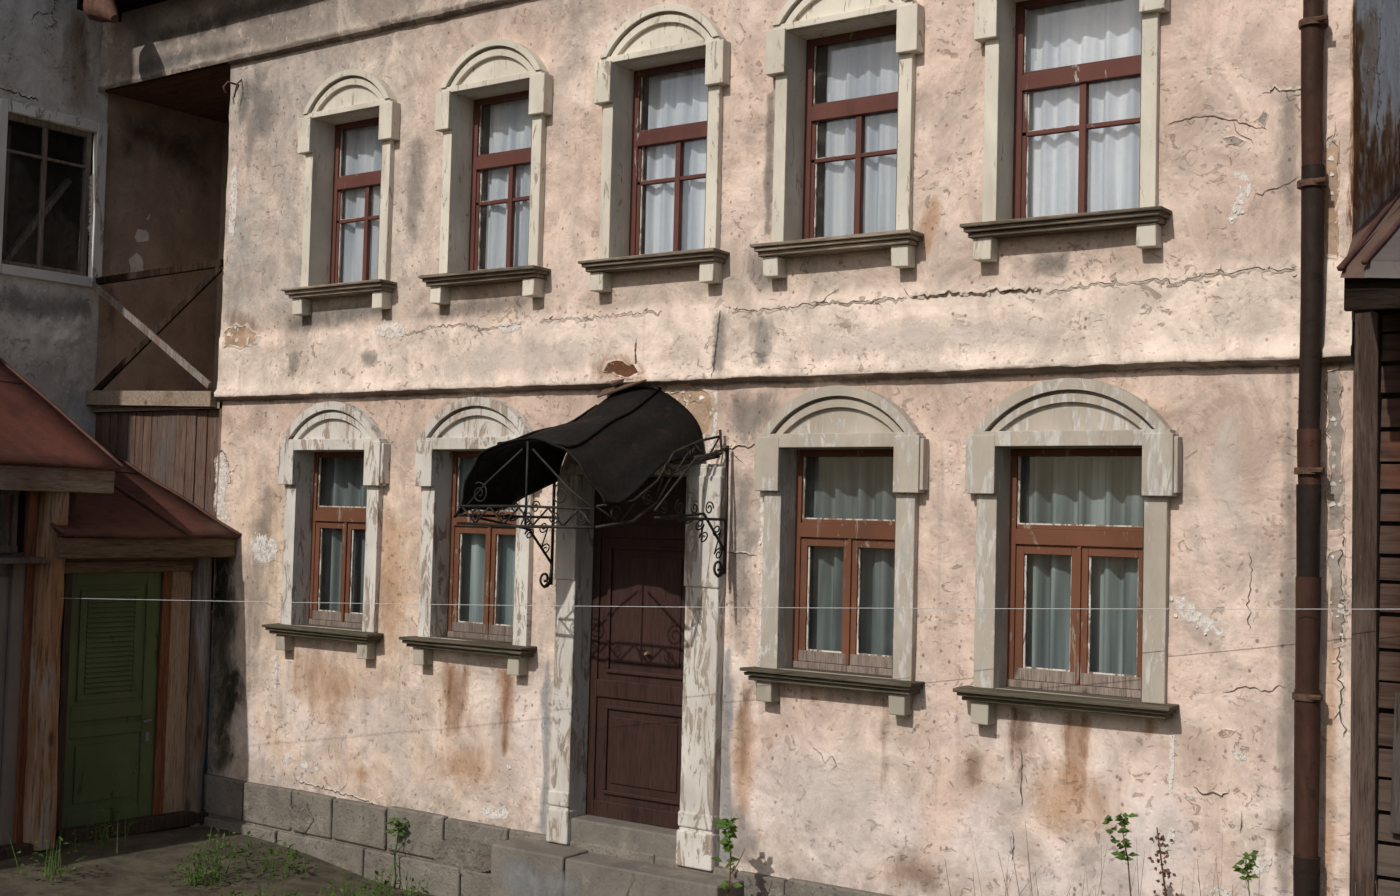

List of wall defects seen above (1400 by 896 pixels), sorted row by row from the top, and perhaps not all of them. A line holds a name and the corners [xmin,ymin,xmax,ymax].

flaking render [222,322,261,350]
crack [398,261,1297,408]
flaking render [600,358,719,451]
peeling [1169,596,1224,637]
crack [1331,534,1352,737]